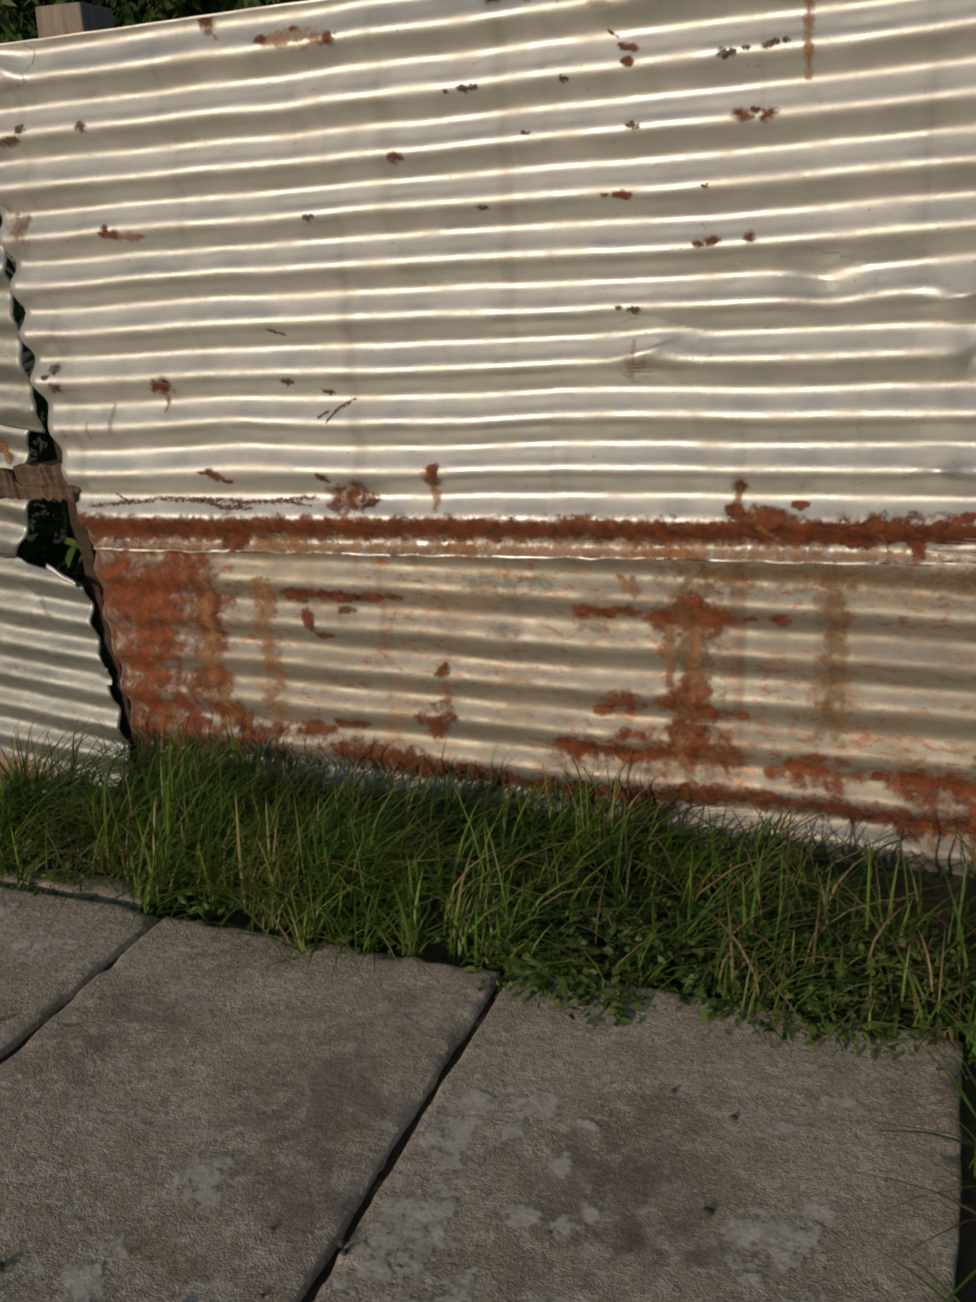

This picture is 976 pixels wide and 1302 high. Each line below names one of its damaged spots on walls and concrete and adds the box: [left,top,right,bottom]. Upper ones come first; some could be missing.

rust [253,26,333,47]
rust [804,0,814,79]
rust [733,106,776,121]
rust [98,225,144,240]
rust [151,379,170,412]
rust [0,441,13,465]
rust [77,464,976,854]